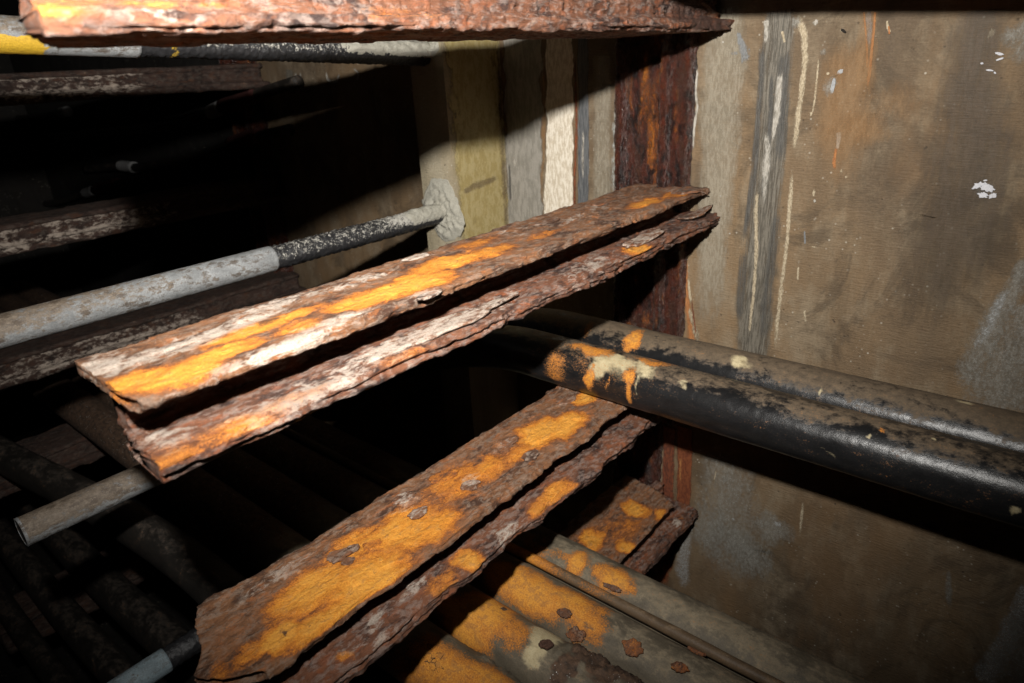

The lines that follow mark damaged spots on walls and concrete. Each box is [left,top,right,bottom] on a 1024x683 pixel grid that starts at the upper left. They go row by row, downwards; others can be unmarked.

leakage [736,9,825,355]
rust [685,266,699,340]
rust [662,425,693,506]